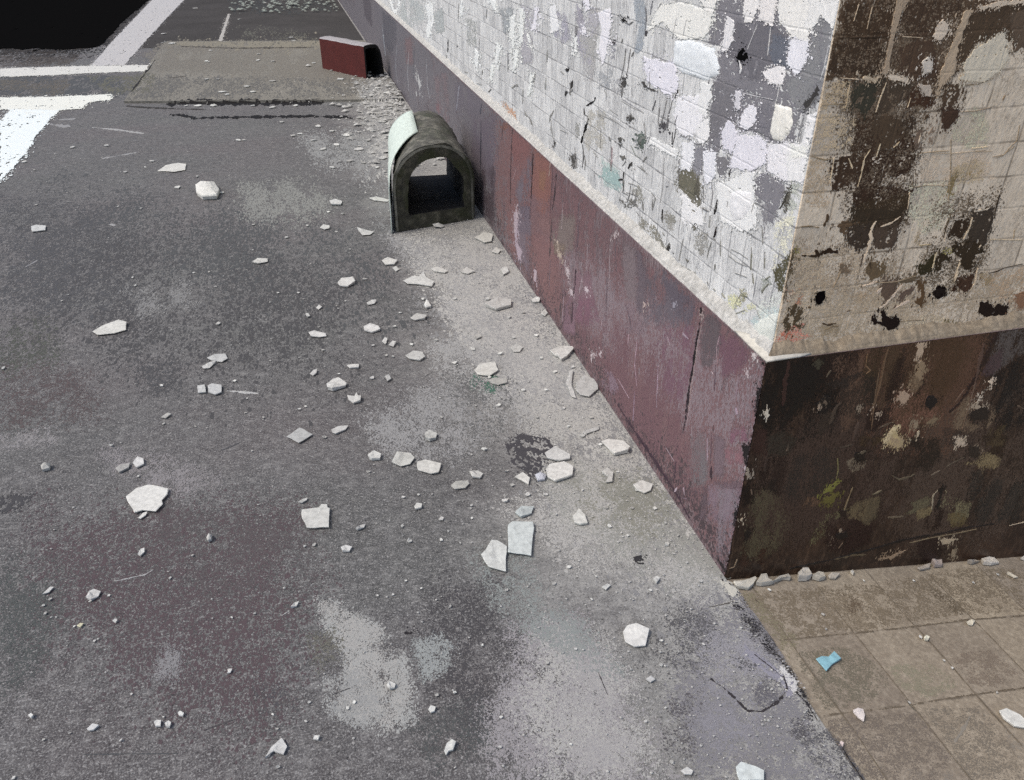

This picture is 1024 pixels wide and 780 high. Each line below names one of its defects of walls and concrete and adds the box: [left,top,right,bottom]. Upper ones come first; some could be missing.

crack [382,0,791,519]
peeling [598,113,647,192]
peeling [674,0,1024,339]